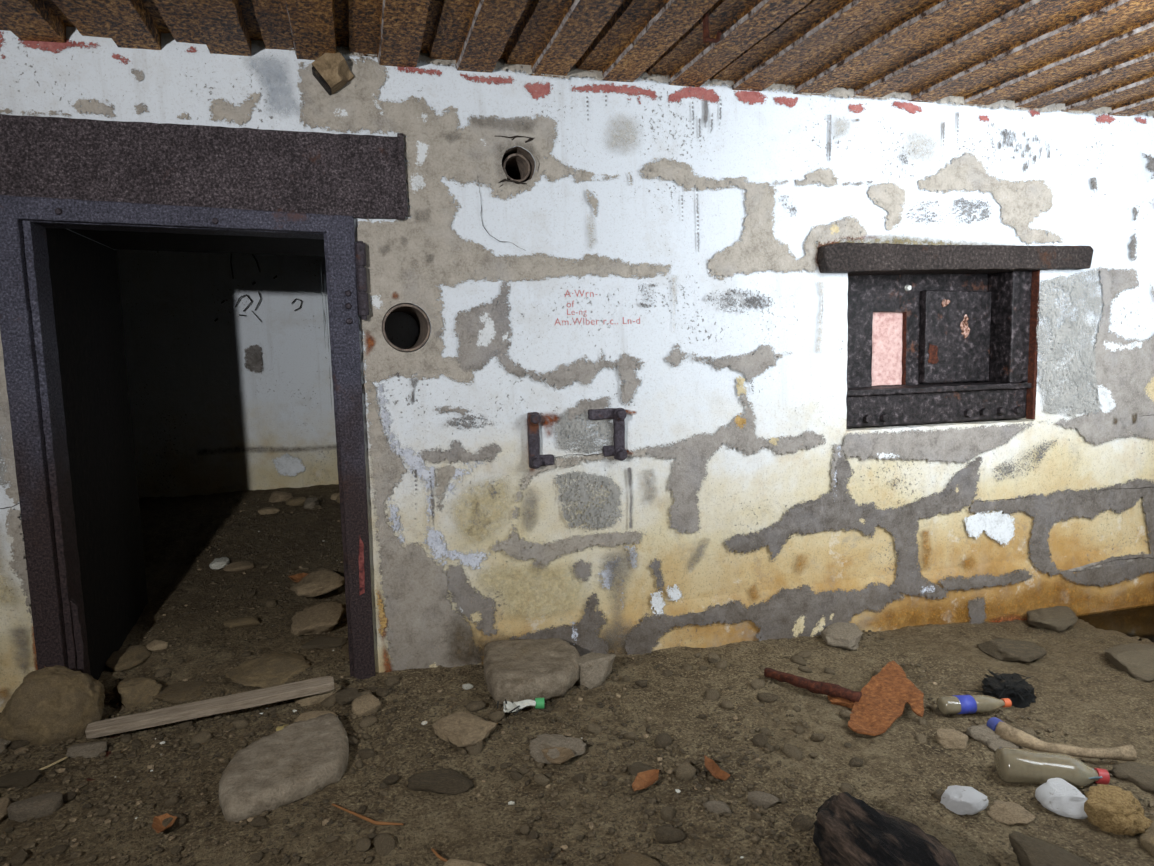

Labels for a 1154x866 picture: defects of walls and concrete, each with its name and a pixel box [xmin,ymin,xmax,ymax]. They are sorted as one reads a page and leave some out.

flaking render [289,46,1154,671]
rust [527,414,559,435]
peeling [0,334,33,626]
water stain [377,383,579,616]
water stain [964,511,1015,547]
water stain [598,545,638,655]
water stain [650,584,682,616]